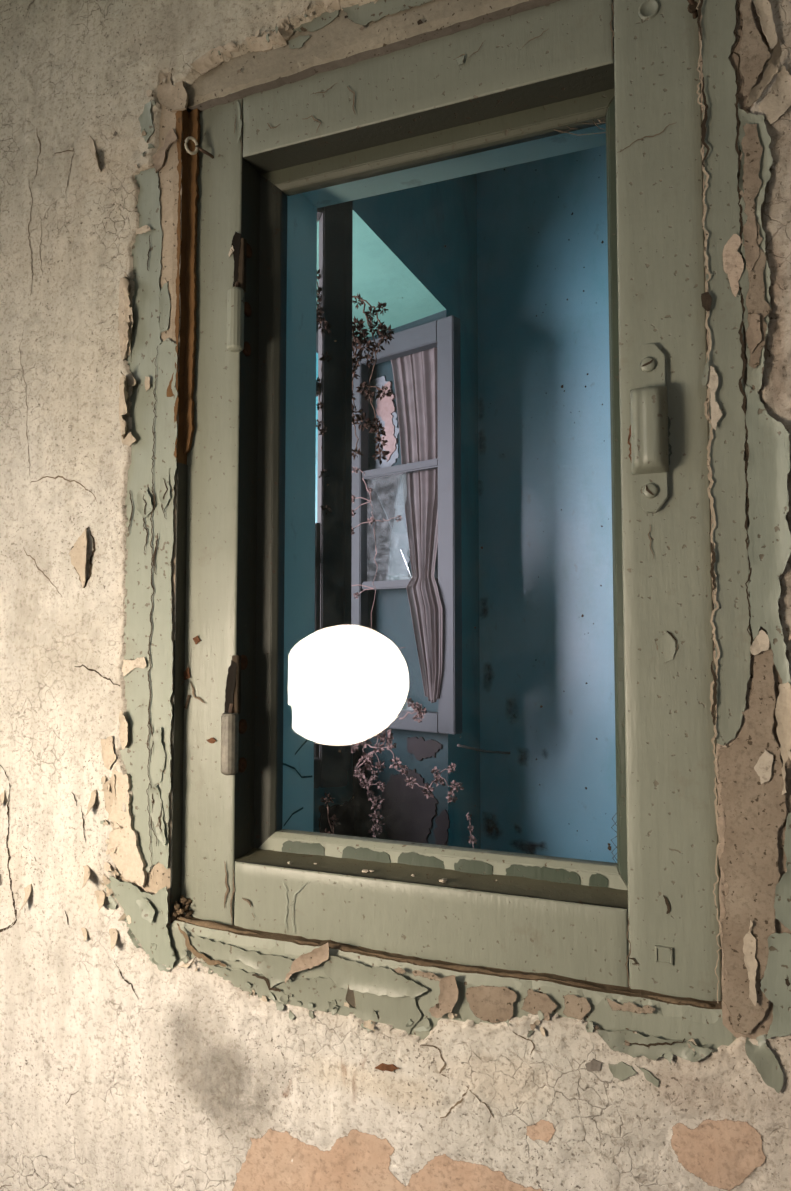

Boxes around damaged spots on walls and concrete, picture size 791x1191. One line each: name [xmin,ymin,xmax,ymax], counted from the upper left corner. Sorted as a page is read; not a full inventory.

peeling [189,0,433,75]
crack [24,550,62,596]
peeling [81,68,713,1087]
peeling [700,0,791,1094]
crack [74,664,120,686]
crack [0,765,17,932]
peeling [232,1128,543,1191]
peeling [526,1120,556,1142]
peeling [671,1119,766,1191]